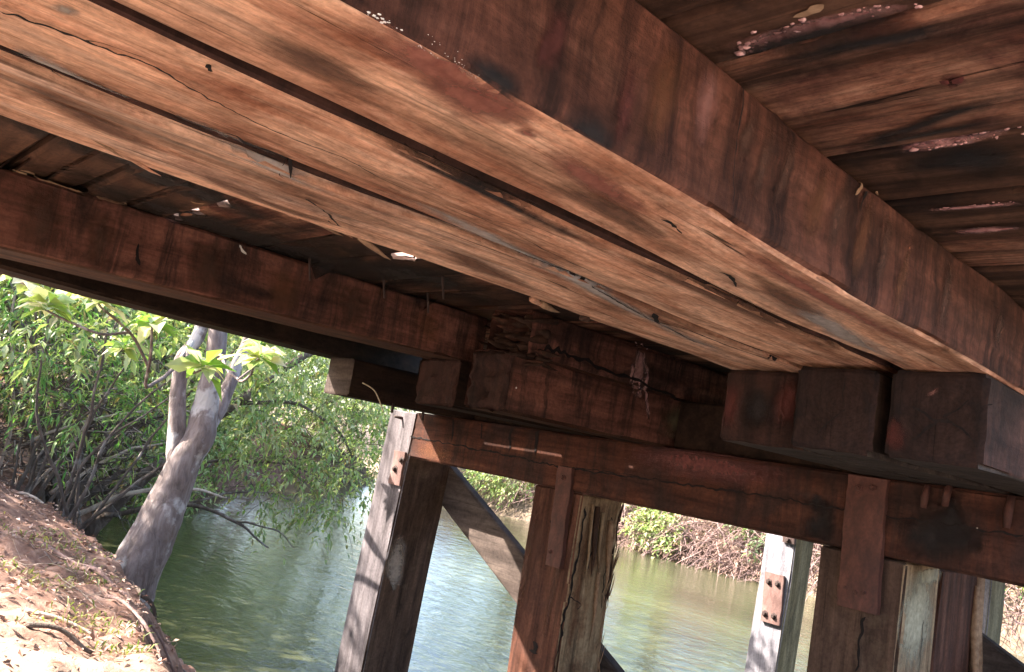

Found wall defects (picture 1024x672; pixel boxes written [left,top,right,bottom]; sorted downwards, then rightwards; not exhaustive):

leakage [744,10,945,59]
leakage [863,103,1010,174]
crack [0,11,777,361]
crack [538,344,682,418]
crack [410,420,845,511]
crack [554,508,613,668]